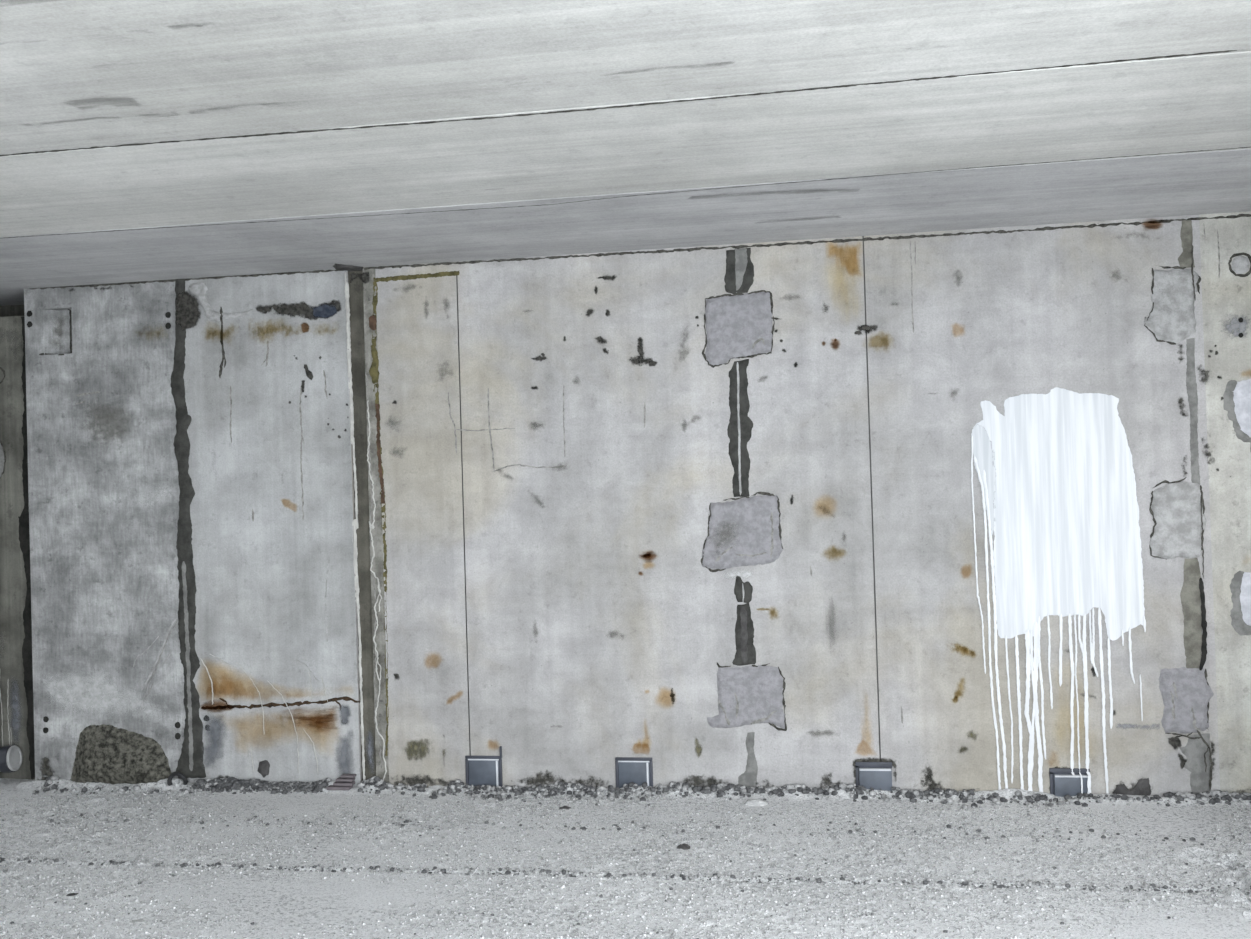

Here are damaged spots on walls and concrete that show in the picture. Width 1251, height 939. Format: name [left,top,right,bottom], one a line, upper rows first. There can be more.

spalling [313,304,337,318]
crack [201,370,387,780]
rust [302,714,333,726]